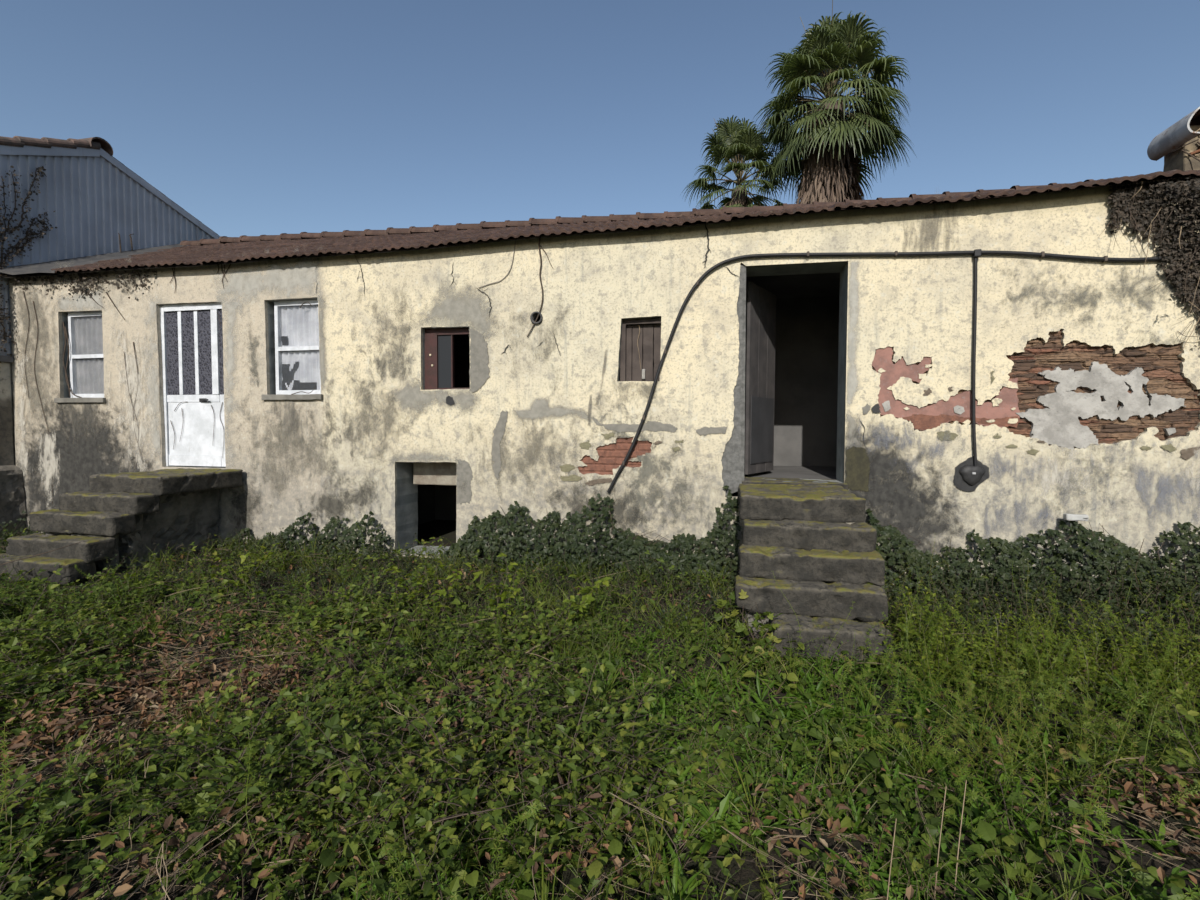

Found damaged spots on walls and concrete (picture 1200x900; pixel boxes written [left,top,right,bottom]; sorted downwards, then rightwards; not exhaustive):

spalling [863,330,1200,460]
spalling [560,432,684,486]
leakage [844,424,963,554]
leakage [985,459,1108,534]
leakage [1136,464,1200,519]